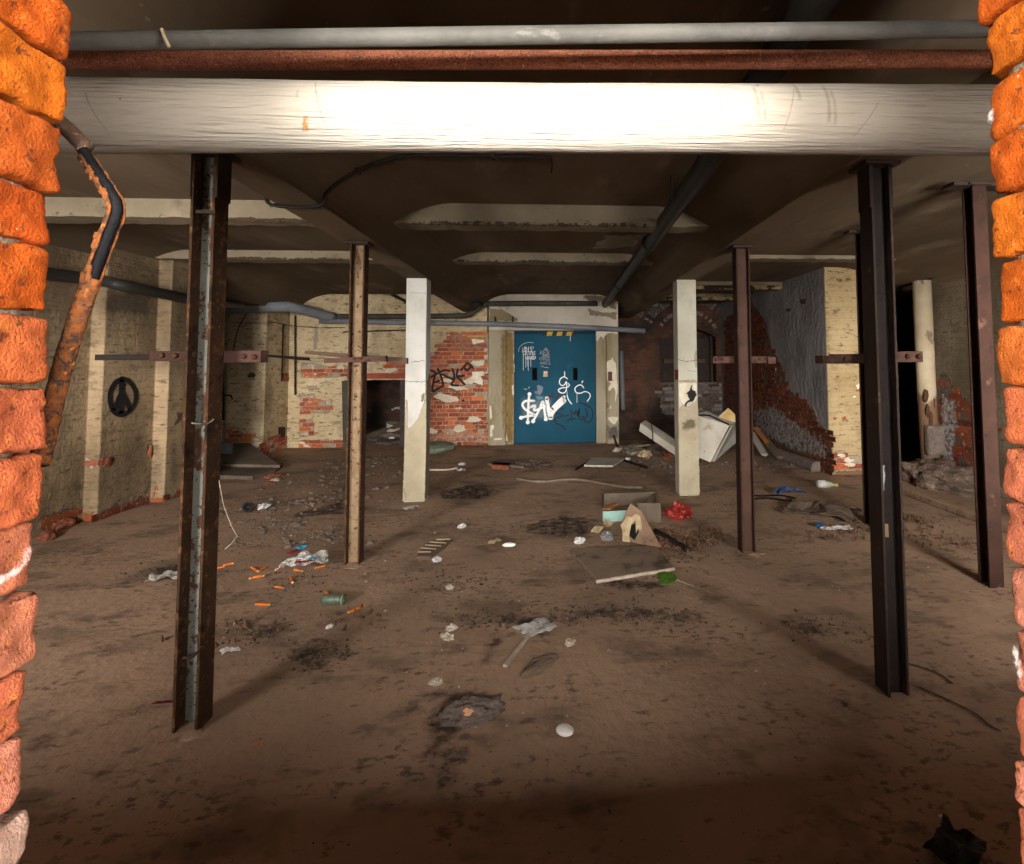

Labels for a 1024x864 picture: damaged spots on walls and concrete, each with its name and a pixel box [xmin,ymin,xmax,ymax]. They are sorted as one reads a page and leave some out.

rust [85,164,109,207]
rust [79,264,93,284]
flaking render [383,362,405,373]
flaking render [402,331,508,501]
peeling [607,358,618,424]
peeling [655,315,735,495]
flaking render [750,285,862,476]
flaking render [936,375,973,466]